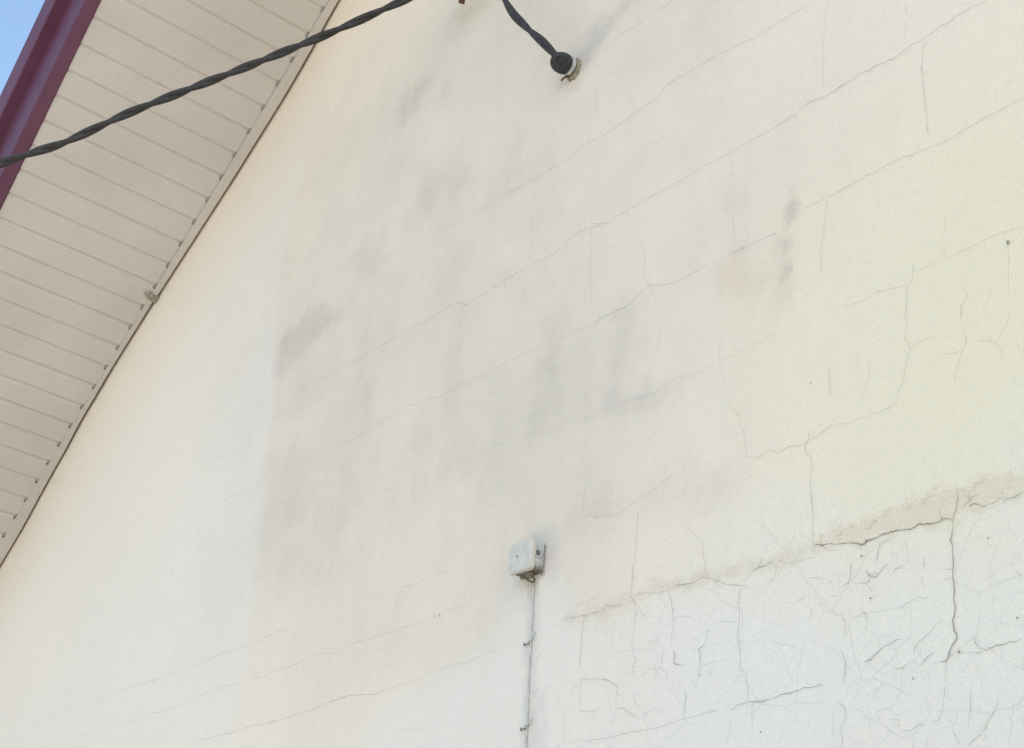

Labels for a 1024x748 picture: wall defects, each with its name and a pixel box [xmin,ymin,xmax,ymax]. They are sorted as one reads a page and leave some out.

crack [670,554,770,668]
crack [805,443,1020,676]